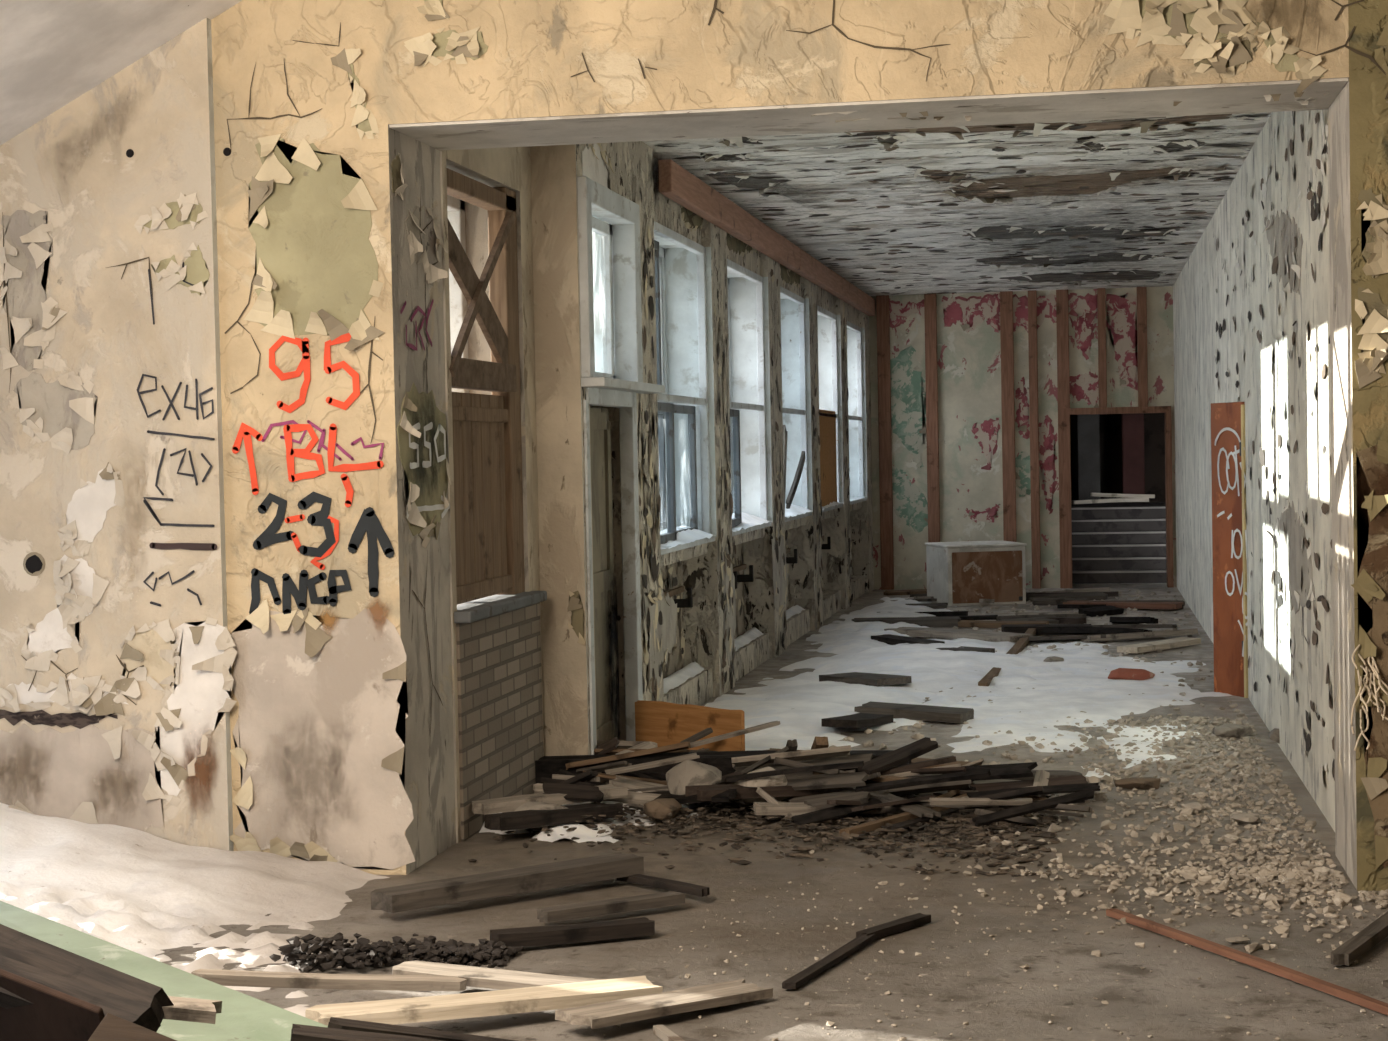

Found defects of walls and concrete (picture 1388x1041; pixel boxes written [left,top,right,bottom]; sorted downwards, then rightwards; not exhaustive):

crack [227,22,341,148]
crack [570,53,595,82]
crack [638,58,657,79]
crack [708,0,724,26]
crack [786,0,950,81]
peeling [0,210,98,454]
peeling [244,134,385,351]
peeling [658,0,1335,787]
peeling [1354,188,1388,389]
peeling [0,462,416,870]
peeling [639,394,685,701]
spalling [1351,440,1388,869]